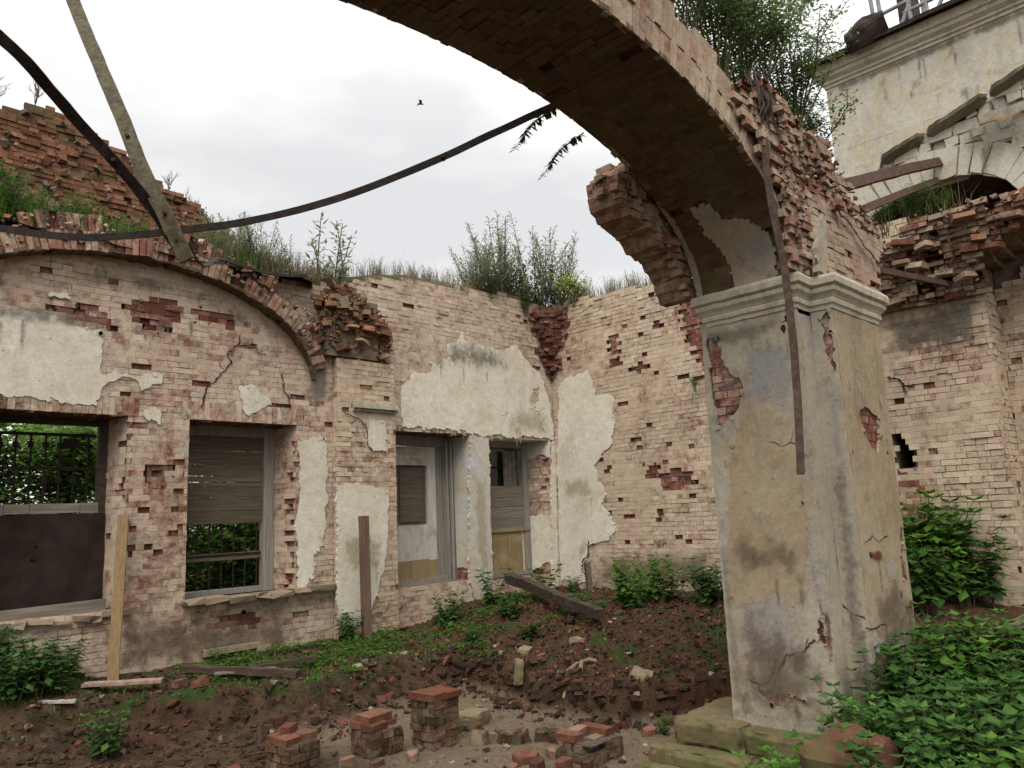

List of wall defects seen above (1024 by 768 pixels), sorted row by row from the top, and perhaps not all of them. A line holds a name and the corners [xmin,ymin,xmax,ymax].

peeling [0,292,163,406]
crack [201,336,266,407]
spalling [818,307,836,369]
peeling [400,331,616,600]
peeling [658,203,827,646]
spalling [859,408,888,454]
peeling [293,436,389,627]
crack [843,604,887,631]
crack [749,636,826,691]